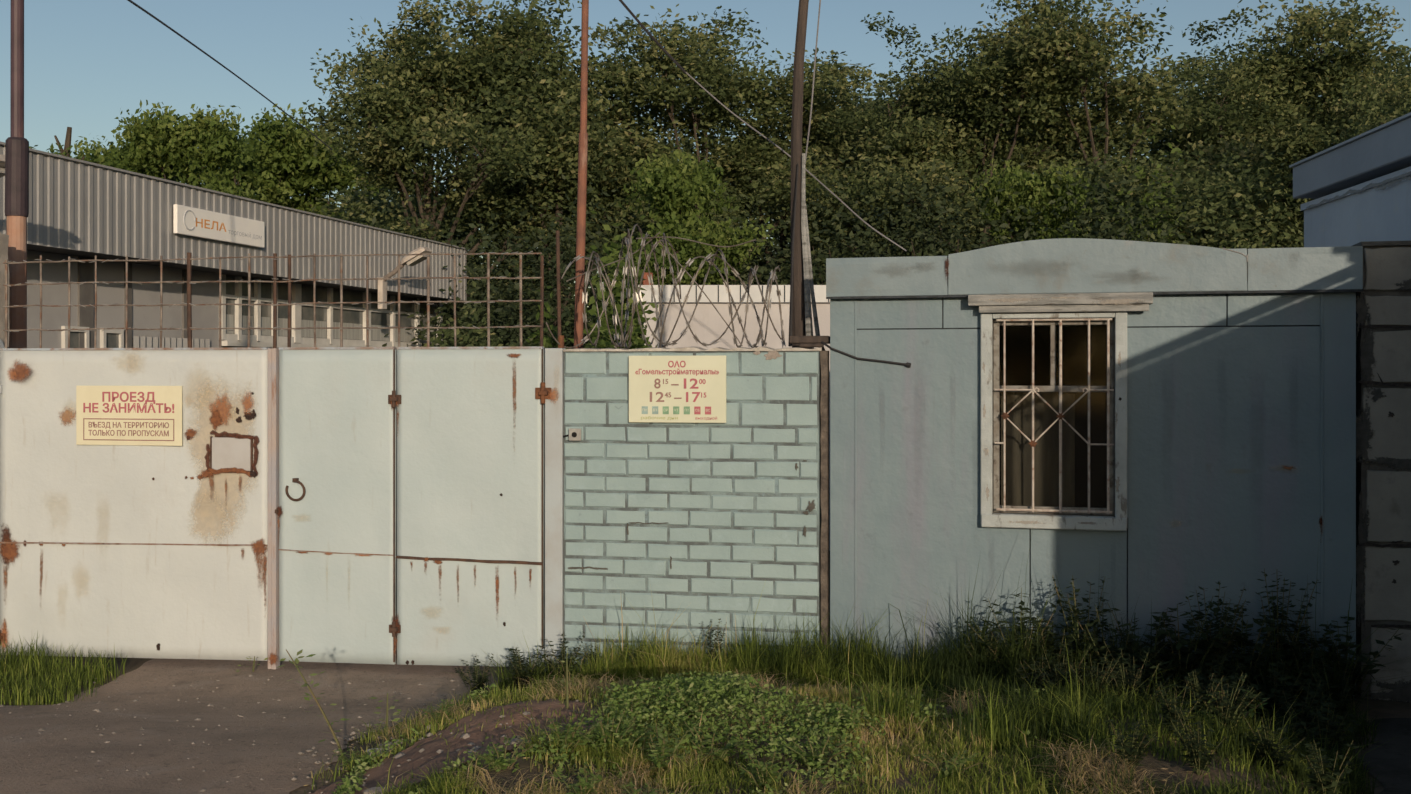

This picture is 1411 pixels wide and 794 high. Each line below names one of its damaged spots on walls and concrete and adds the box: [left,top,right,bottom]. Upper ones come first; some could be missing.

rust [8,362,31,382]
rust [507,353,520,410]
rust [62,410,76,424]
rust [185,393,259,493]
rust [0,527,43,601]
rust [241,539,267,605]
rust [410,557,476,591]
rust [495,569,532,606]